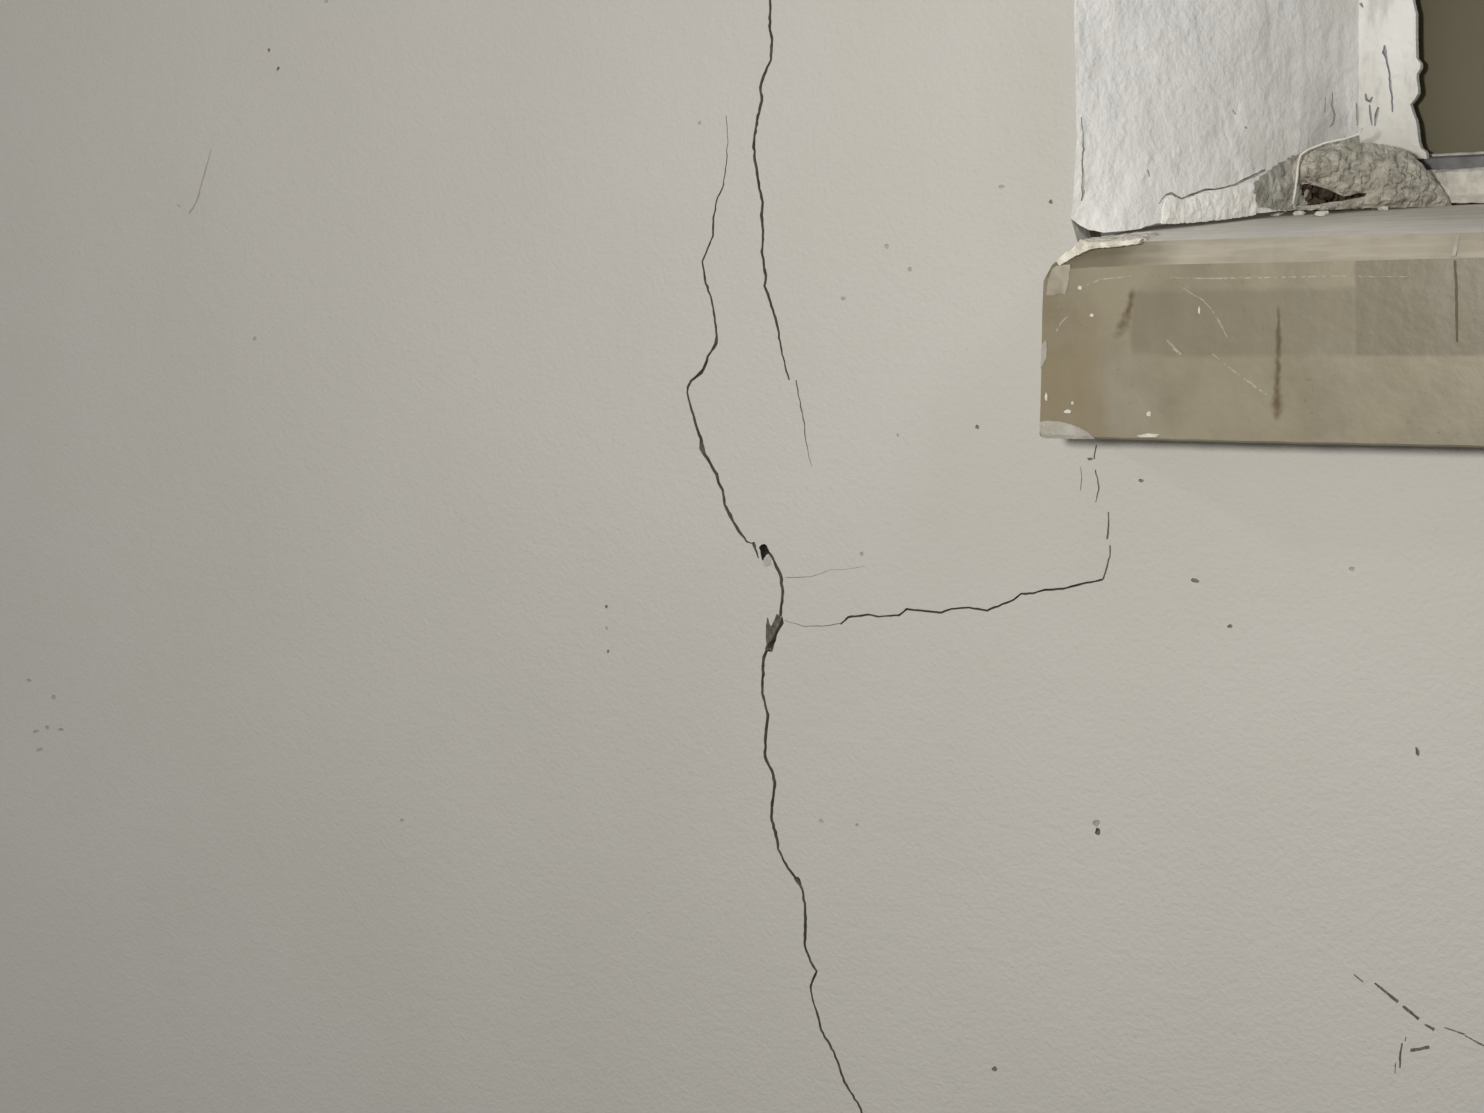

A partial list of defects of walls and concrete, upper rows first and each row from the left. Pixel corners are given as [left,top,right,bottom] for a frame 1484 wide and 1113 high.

crack [686,0,1111,1113]
spalling [1161,45,1452,224]